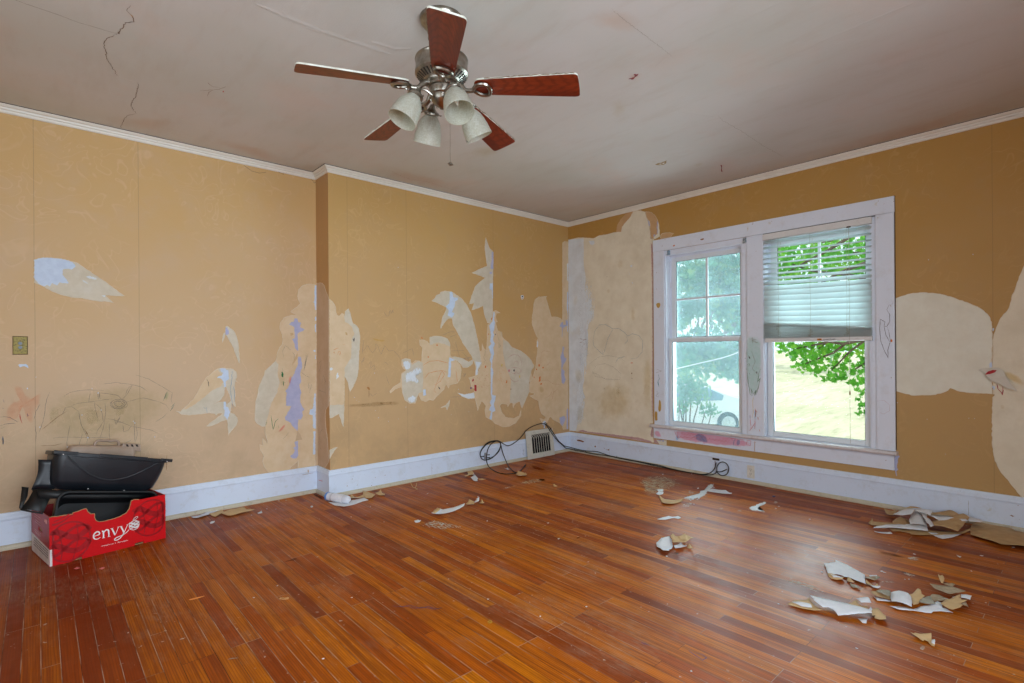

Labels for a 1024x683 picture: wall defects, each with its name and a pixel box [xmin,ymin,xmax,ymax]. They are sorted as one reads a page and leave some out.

crack [16,0,139,123]
peeling [34,257,75,286]
peeling [446,292,458,317]
peeling [217,368,229,387]
peeling [285,285,317,459]
peeling [475,312,496,420]